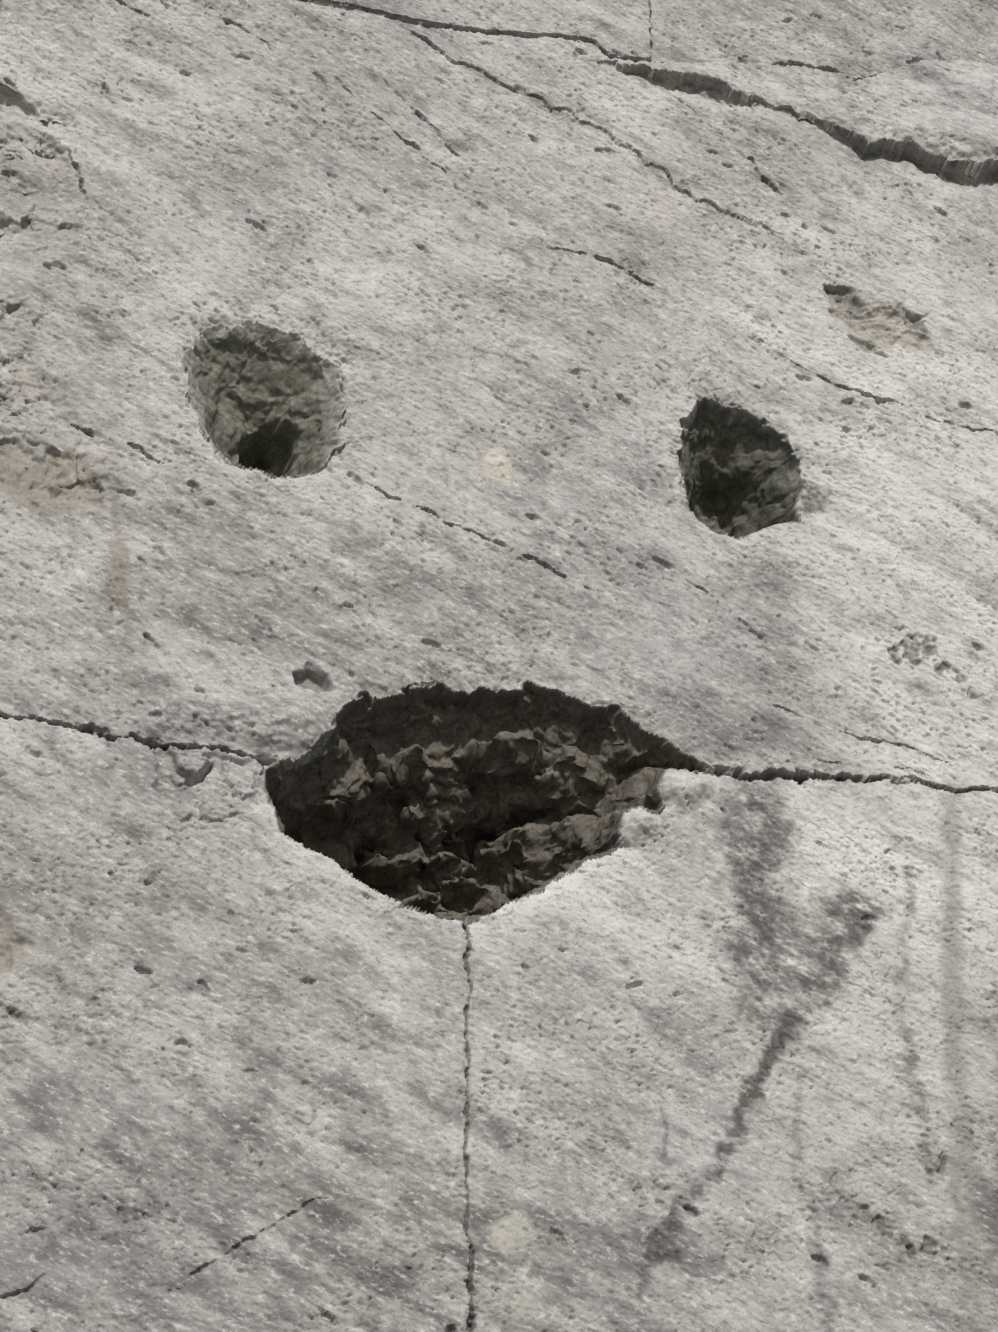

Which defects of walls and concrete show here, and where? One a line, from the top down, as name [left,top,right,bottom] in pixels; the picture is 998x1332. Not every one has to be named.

crack [115,0,153,17]
crack [204,6,275,51]
crack [757,60,883,82]
crack [297,0,809,261]
crack [0,710,277,768]
spalling [148,660,721,922]
crack [462,920,478,1332]
water stain [717,1012,801,1176]
water stain [639,1187,701,1286]